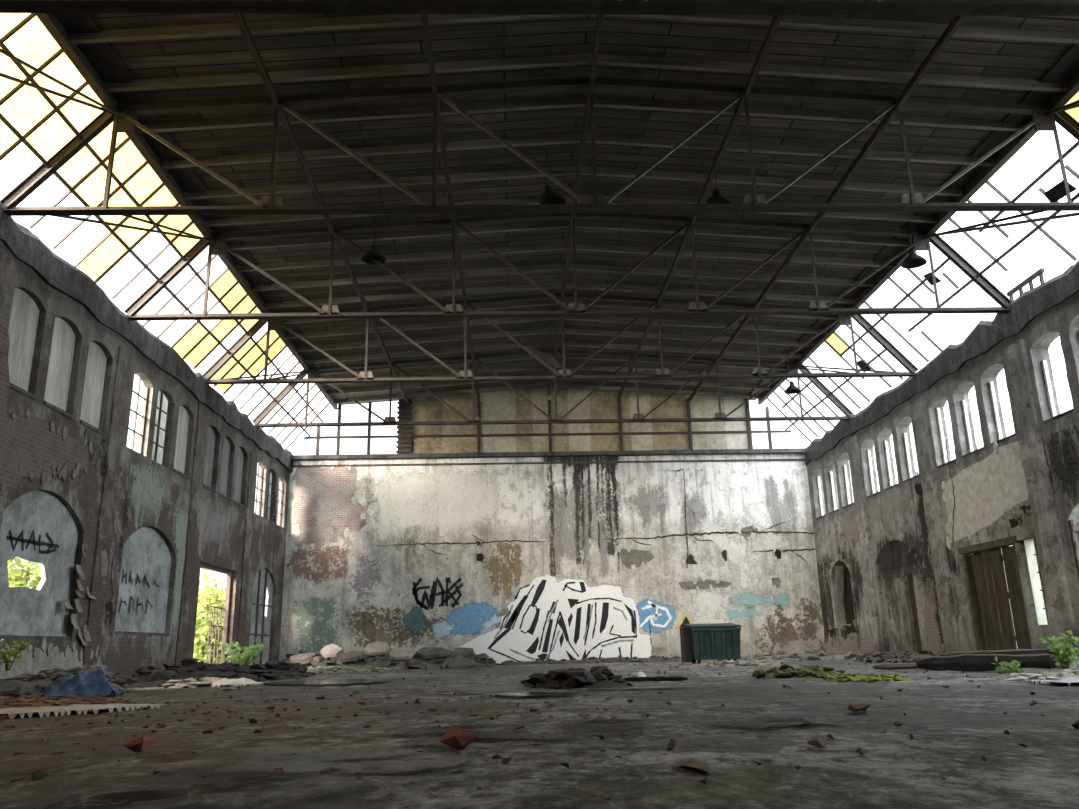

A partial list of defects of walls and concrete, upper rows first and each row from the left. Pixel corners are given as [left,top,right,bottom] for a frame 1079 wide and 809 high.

flaking render [0,545,115,679]
leakage [543,456,667,586]
leakage [682,496,758,589]
leakage [866,493,944,644]
leakage [1041,425,1079,503]